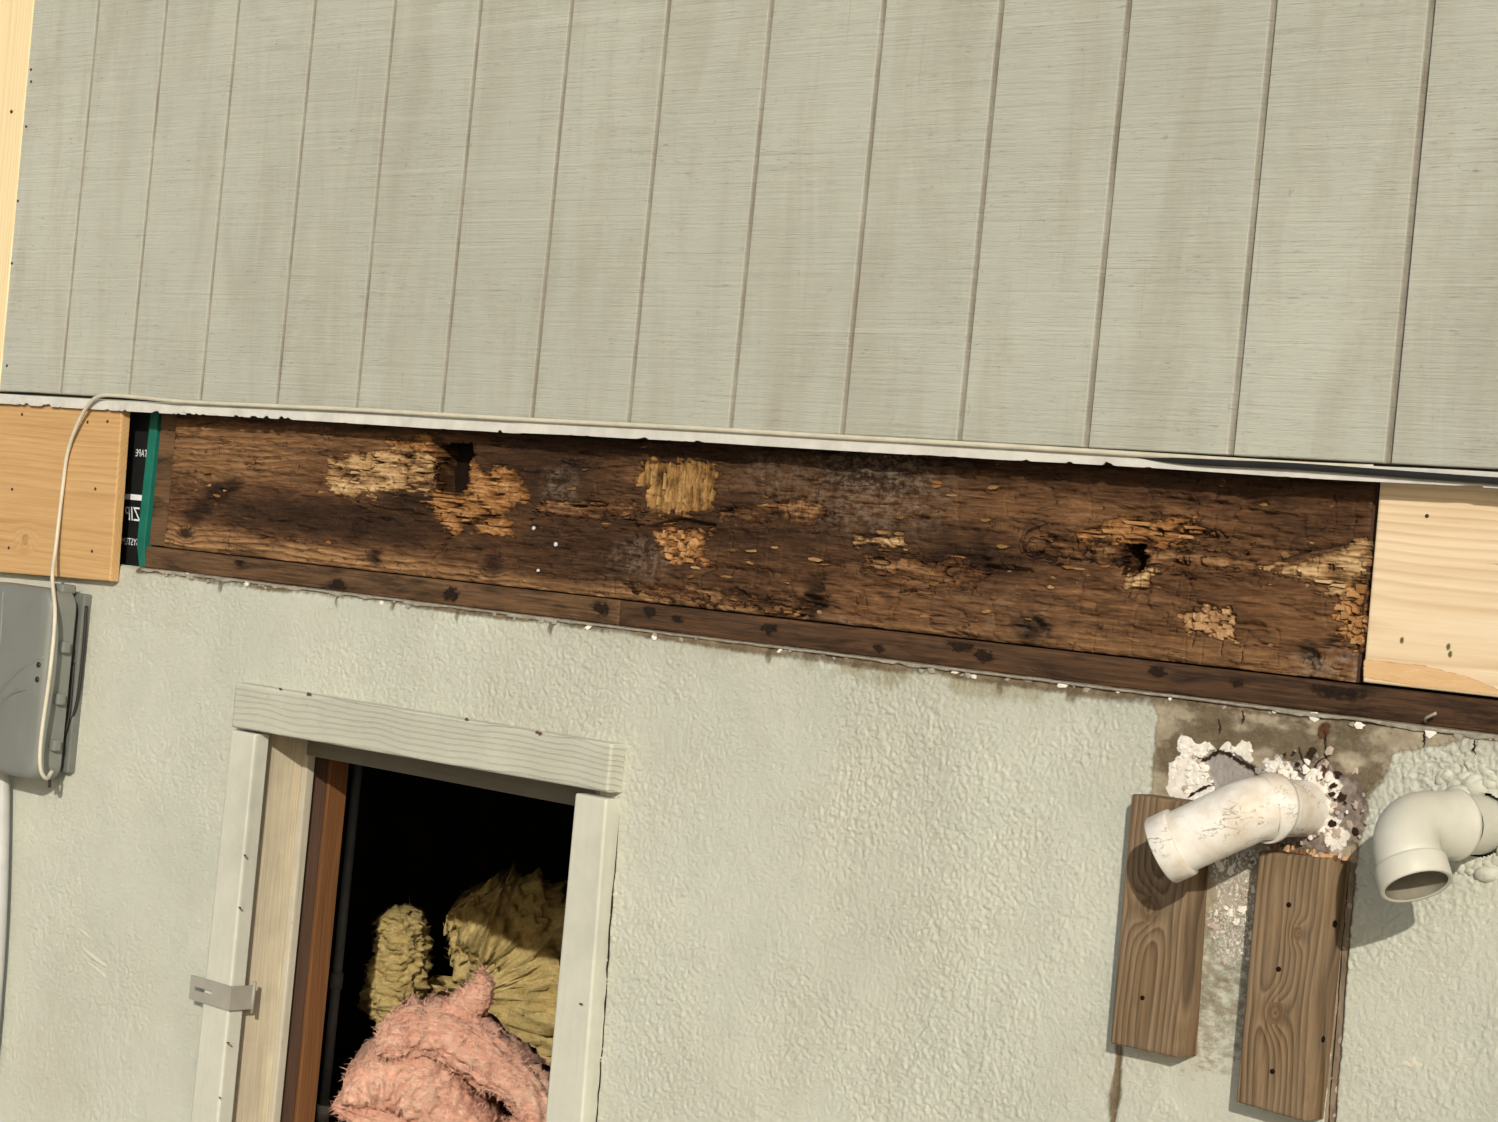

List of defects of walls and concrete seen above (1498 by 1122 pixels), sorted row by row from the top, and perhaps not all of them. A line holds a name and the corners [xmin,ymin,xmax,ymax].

damp [136,560,1498,741]
peeling [141,568,1498,1057]
damp [1109,1045,1122,1122]